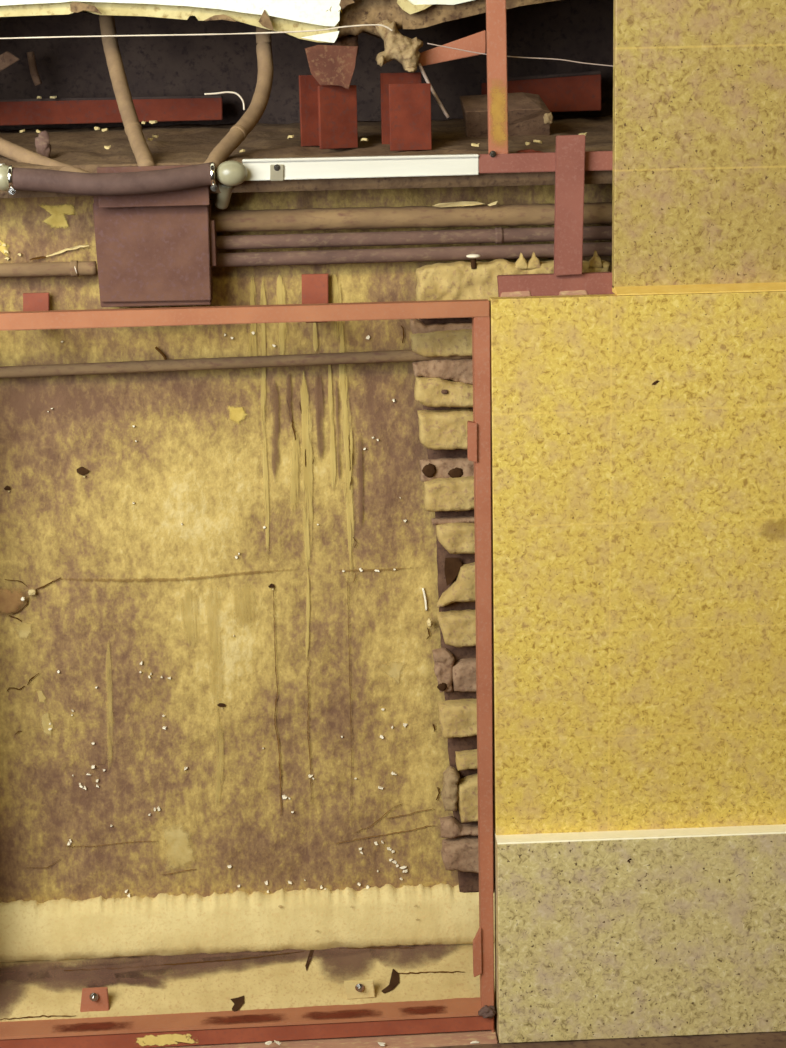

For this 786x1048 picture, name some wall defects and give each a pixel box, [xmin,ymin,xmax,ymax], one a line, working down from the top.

spalling [506,0,558,9]
spalling [0,0,486,58]
leakage [250,275,286,305]
leakage [332,275,341,303]
leakage [248,321,363,659]